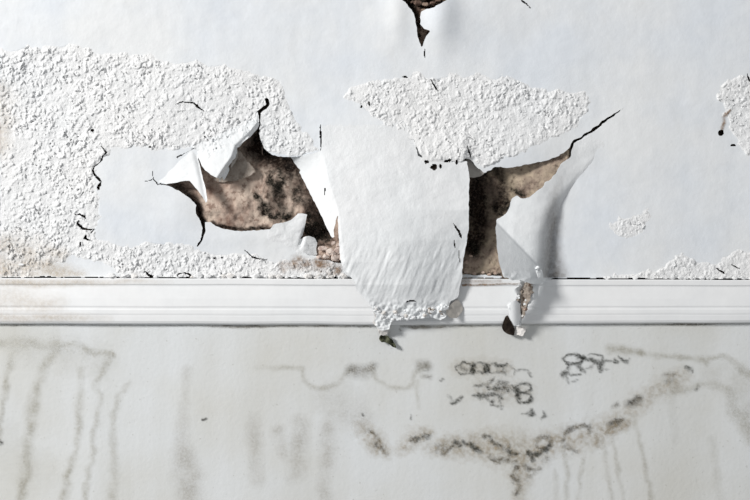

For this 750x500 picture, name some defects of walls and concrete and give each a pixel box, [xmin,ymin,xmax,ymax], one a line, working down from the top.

spalling [403,0,446,47]
crack [257,98,269,121]
crack [571,110,620,146]
crack [92,146,107,190]
peeling [0,43,591,336]
crack [76,213,94,246]
leakage [561,353,628,376]
leakage [457,361,534,416]
leakage [483,435,552,478]